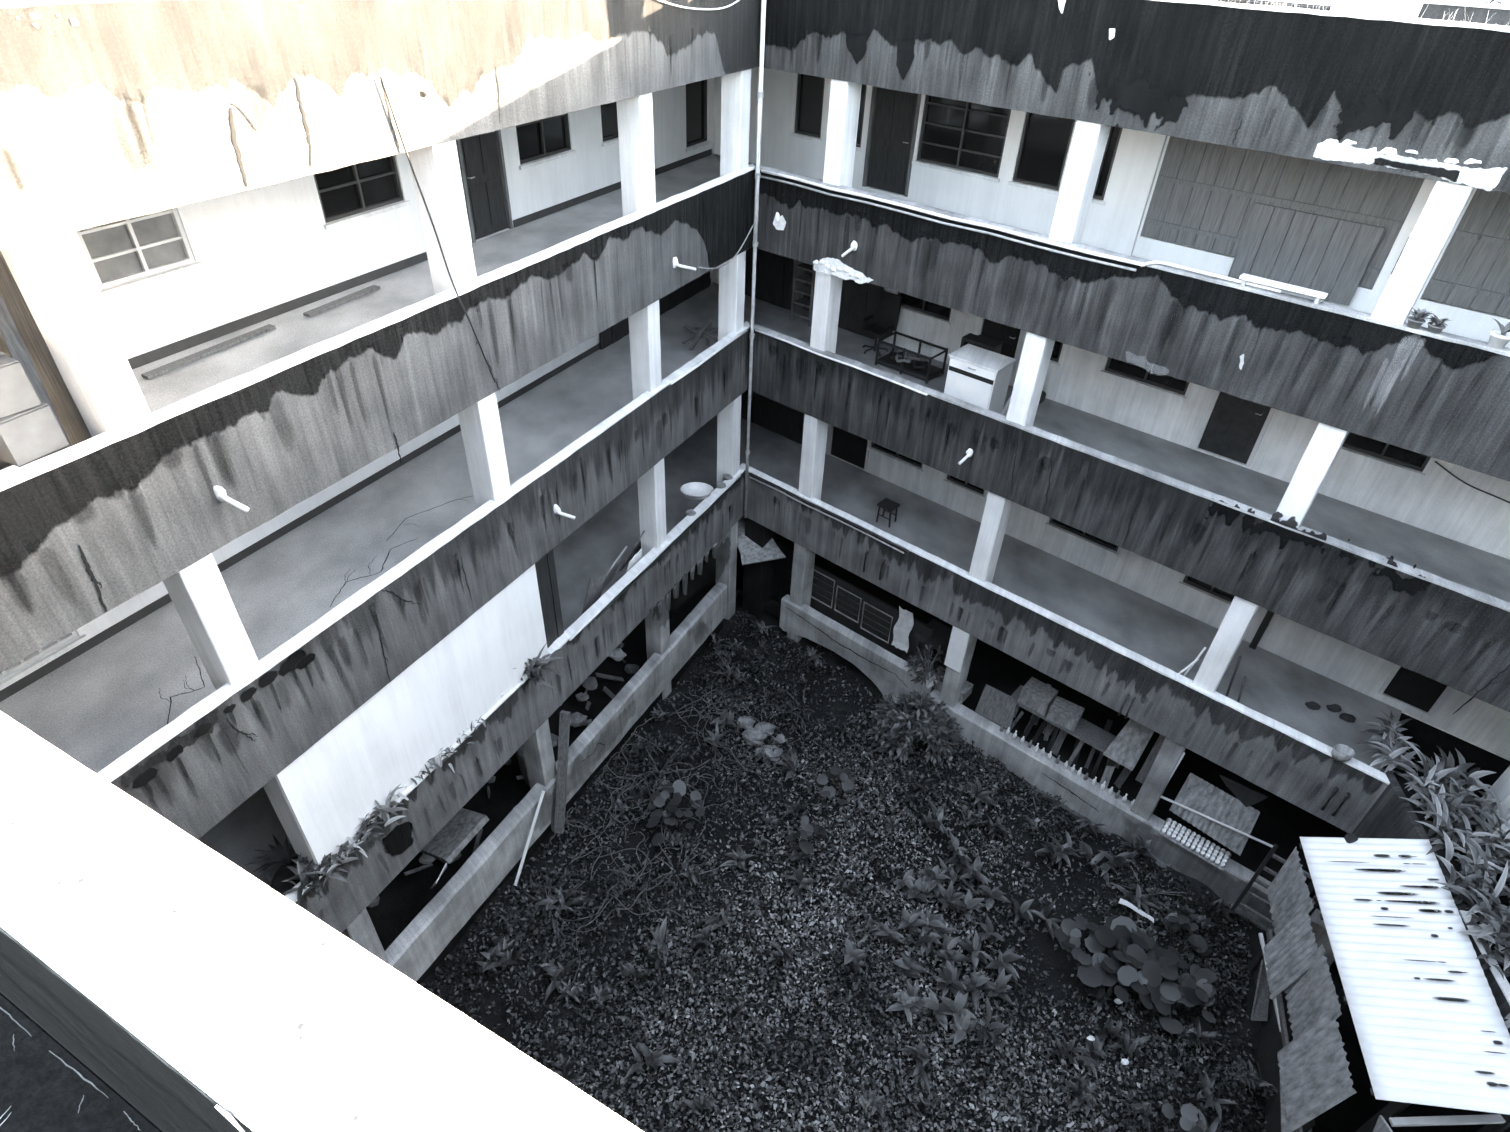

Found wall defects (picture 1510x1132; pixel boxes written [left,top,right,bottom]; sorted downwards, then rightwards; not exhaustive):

crack [229,102,259,187]
crack [295,77,312,168]
damp [0,0,1510,140]
damp [0,169,1500,578]
crack [78,545,107,611]
crack [330,495,474,680]
damp [567,578,637,645]
damp [772,485,1383,794]
damp [1206,500,1431,595]
damp [295,662,550,909]